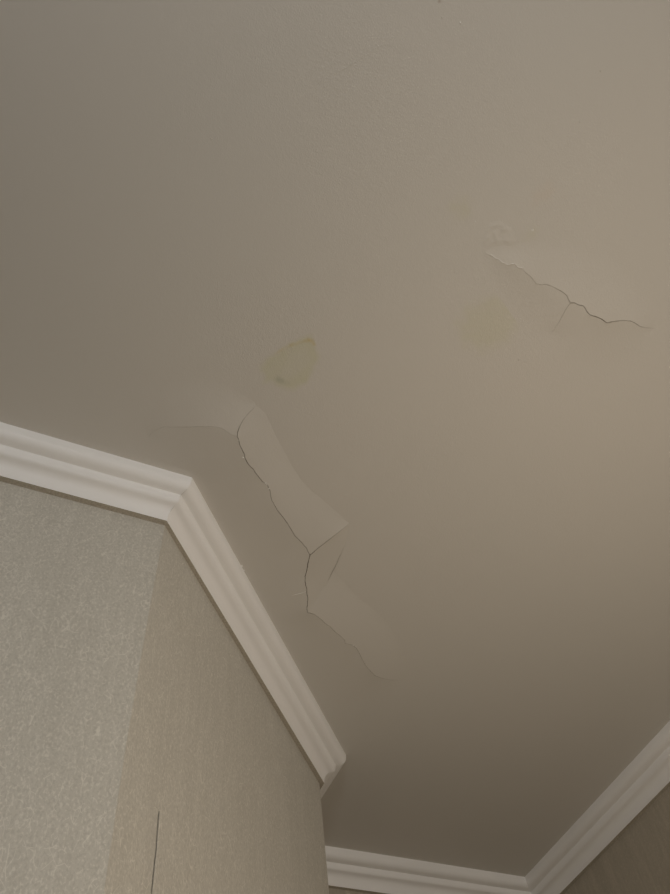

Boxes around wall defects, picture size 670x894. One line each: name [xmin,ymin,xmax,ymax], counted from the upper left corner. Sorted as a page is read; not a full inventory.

peeling [137,379,406,742]